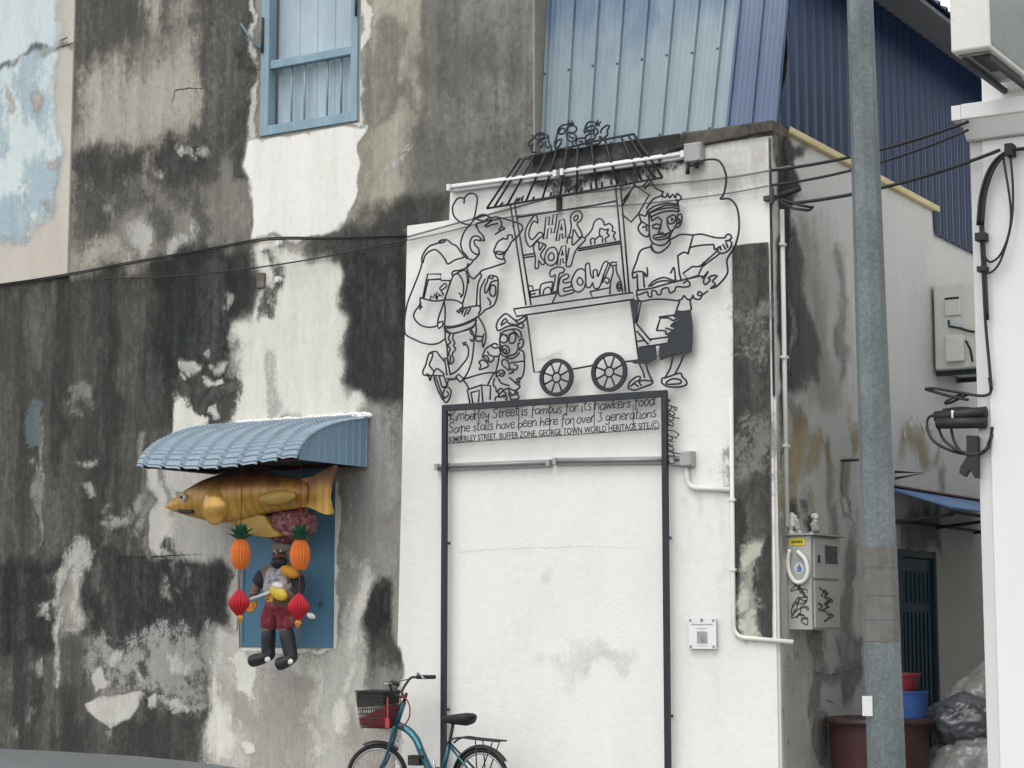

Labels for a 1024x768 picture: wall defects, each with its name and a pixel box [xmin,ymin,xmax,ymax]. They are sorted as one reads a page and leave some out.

peeling [0,0,65,245]
damp [0,0,259,765]
damp [769,133,848,466]